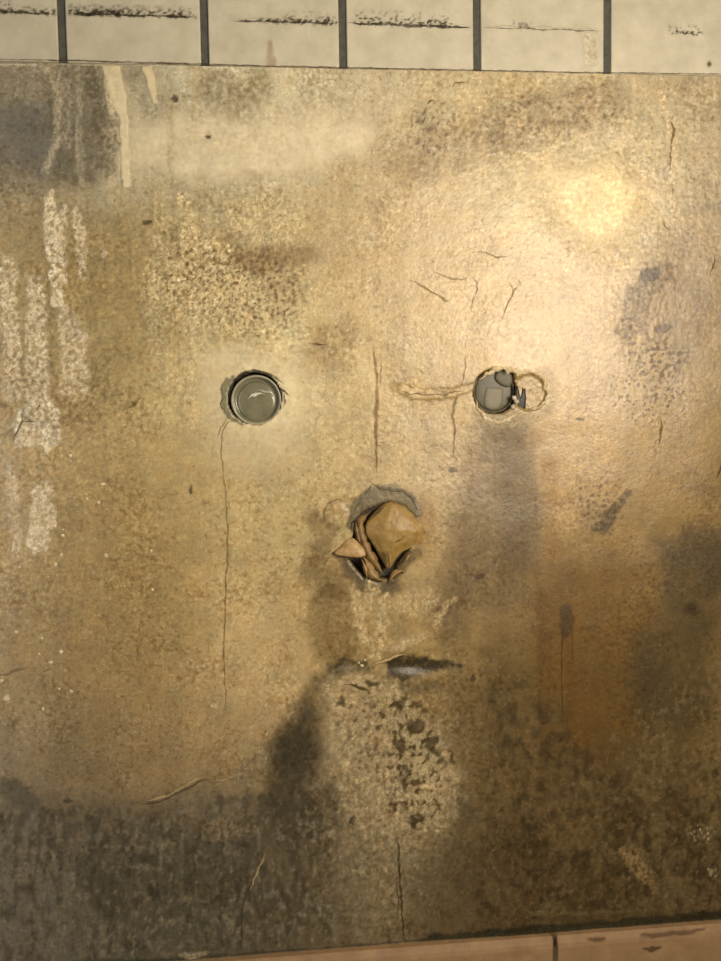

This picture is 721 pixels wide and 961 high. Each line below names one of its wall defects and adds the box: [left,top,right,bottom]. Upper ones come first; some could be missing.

leakage [0,65,115,183]
crack [668,123,676,190]
leakage [618,263,671,339]
flaking render [476,366,557,425]
leakage [615,324,684,422]
spalling [347,484,432,543]
leakage [439,417,536,635]
leakage [271,670,335,809]
crack [144,772,243,801]
crack [396,840,405,941]
leakage [347,910,721,947]